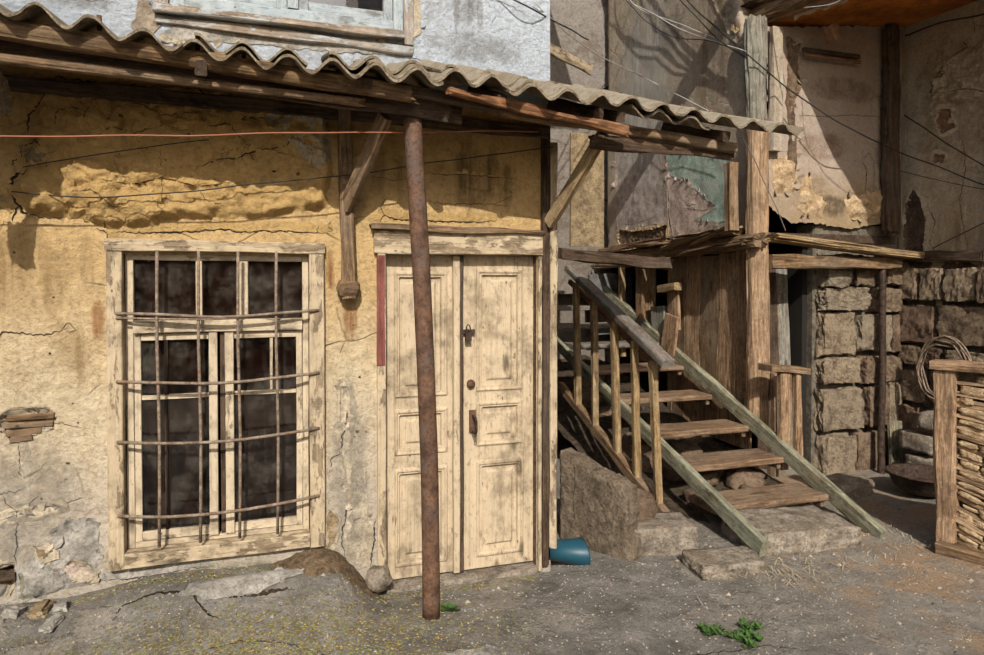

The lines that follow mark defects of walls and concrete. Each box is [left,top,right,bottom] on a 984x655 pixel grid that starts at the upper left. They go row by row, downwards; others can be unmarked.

crack [9,76,333,238]
flaking render [611,152,734,251]
spalling [844,189,883,223]
crack [0,322,76,336]
flaking render [0,498,103,603]
crack [101,559,295,619]
crack [203,640,324,655]